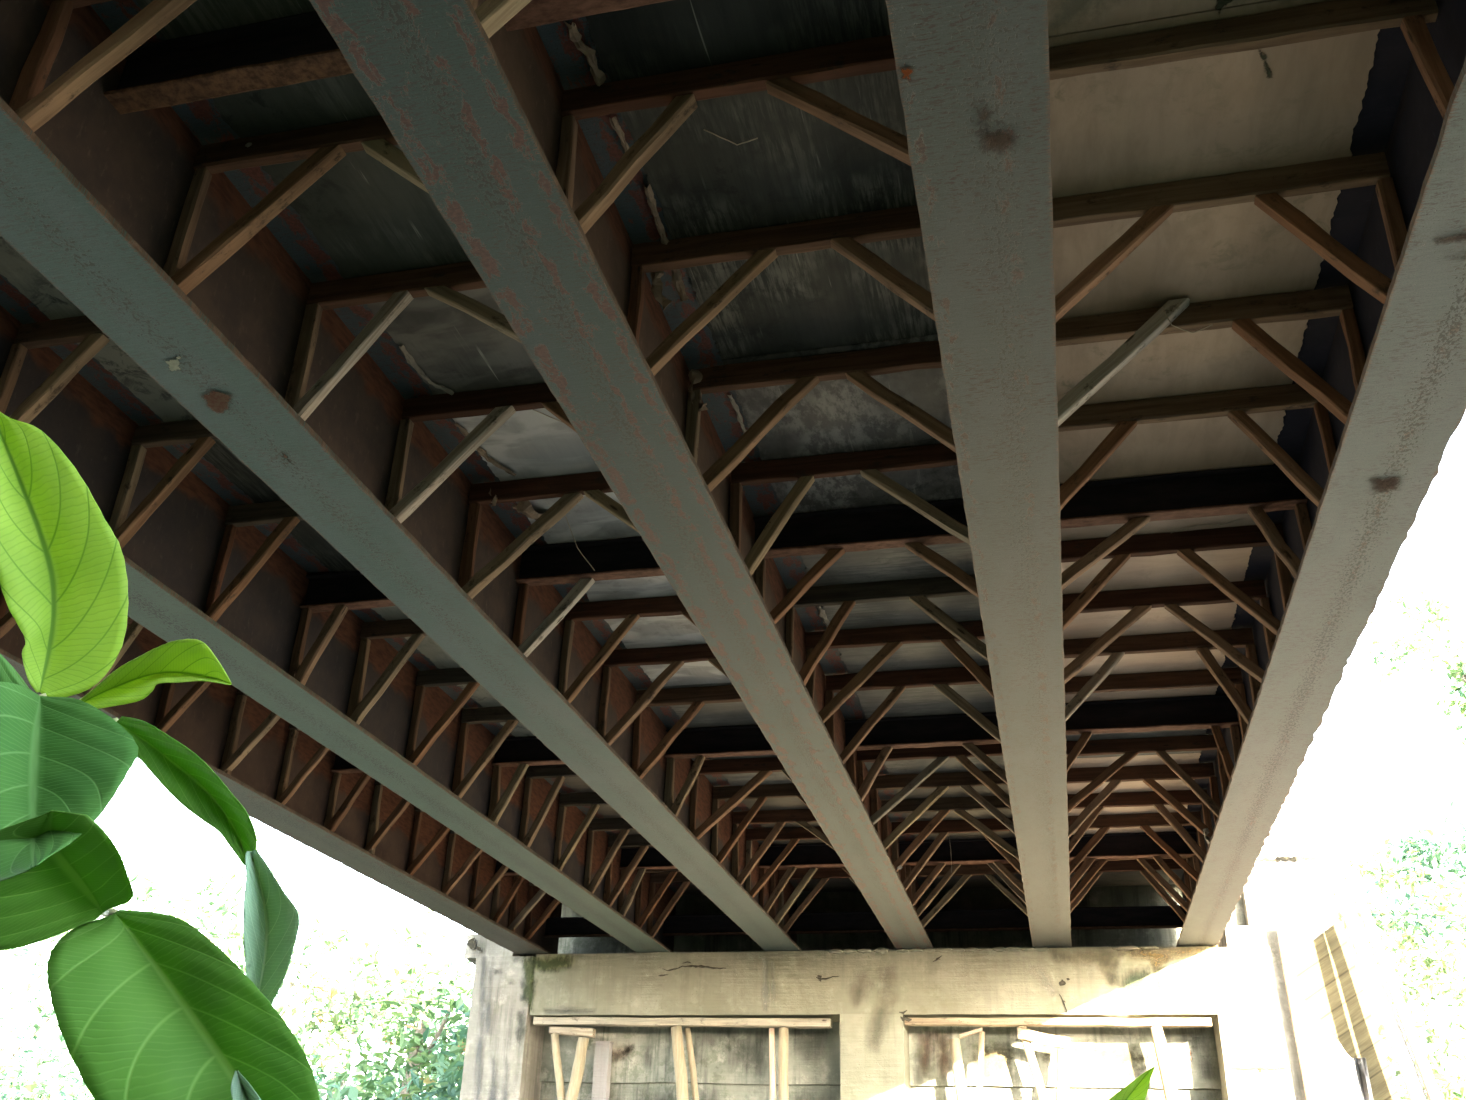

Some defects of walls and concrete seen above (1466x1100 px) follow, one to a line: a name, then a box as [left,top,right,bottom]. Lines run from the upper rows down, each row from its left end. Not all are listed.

corrosion [1370,477,1400,493]
water stain [1094,952,1166,1015]